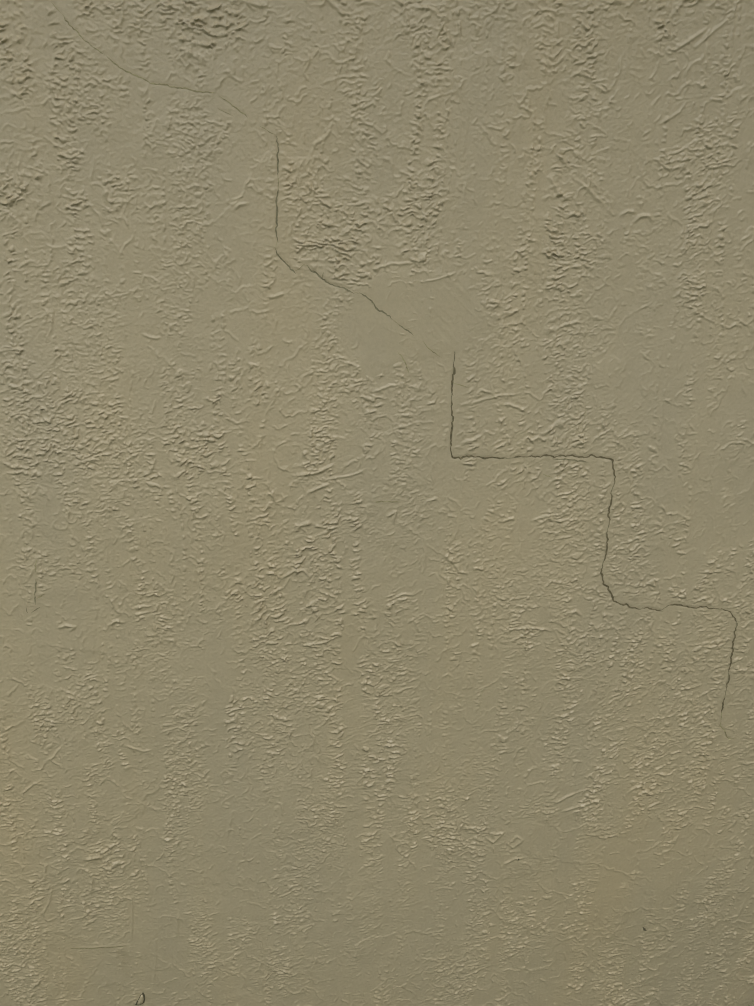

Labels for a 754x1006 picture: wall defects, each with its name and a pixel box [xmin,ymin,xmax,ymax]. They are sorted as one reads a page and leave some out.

crack [52,3,738,739]